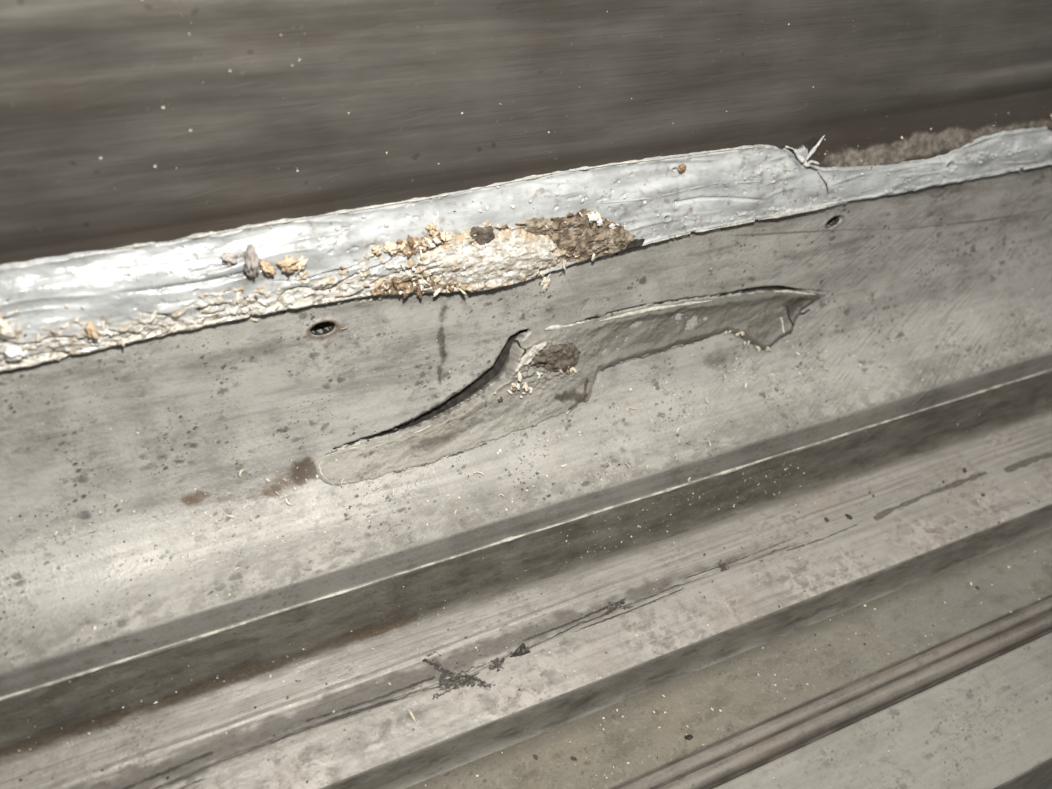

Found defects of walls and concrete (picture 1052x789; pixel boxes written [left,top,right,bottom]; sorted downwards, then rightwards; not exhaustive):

spalling [0,208,636,371]
peeling [313,289,825,486]